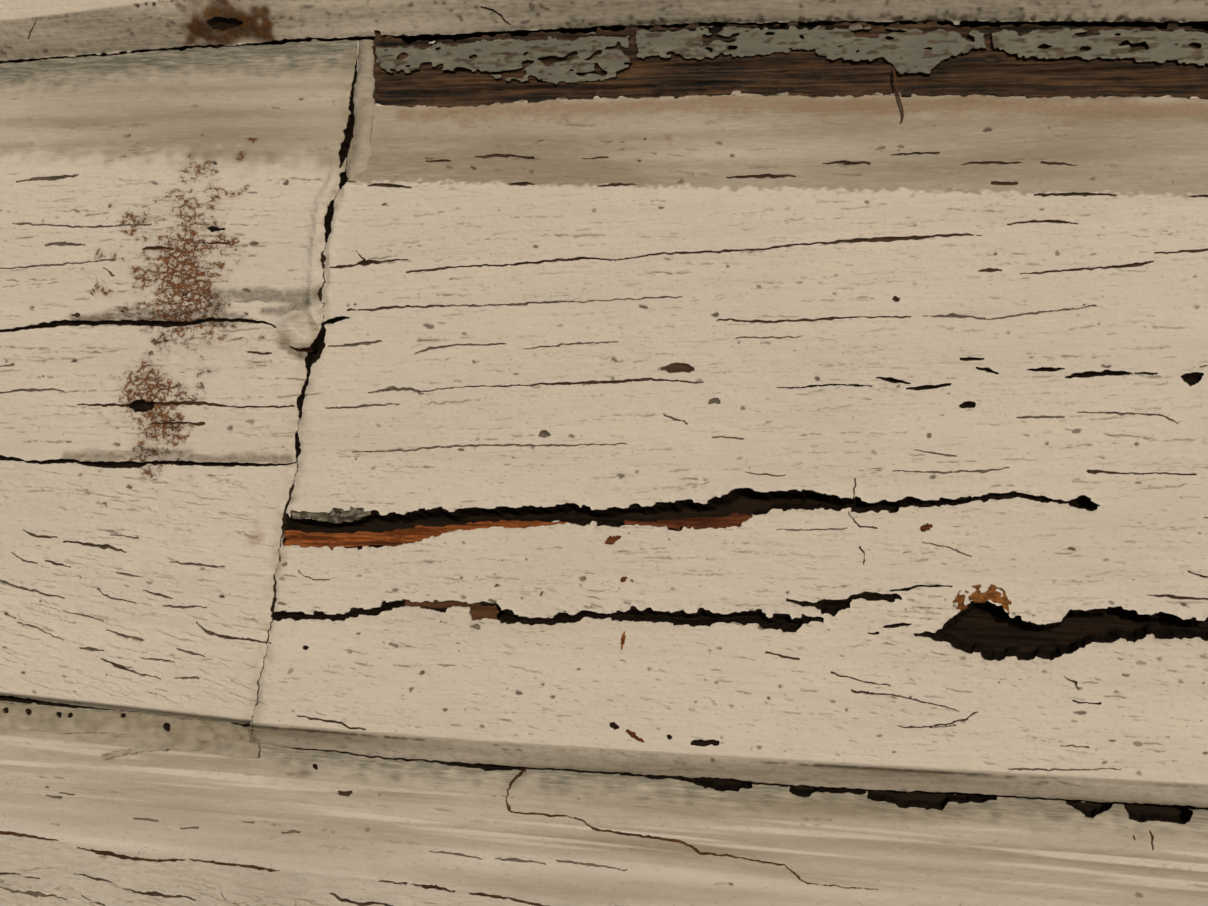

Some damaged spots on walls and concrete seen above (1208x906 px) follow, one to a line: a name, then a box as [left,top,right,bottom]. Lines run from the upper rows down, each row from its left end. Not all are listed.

rust [187,0,275,47]
peeling [376,23,1208,85]
crack [0,317,277,355]
rust [95,155,249,478]
crack [0,363,294,426]
crack [326,377,704,409]
crack [777,357,1158,391]
crack [0,455,296,468]
crack [273,449,1197,660]
crack [830,671,978,728]
crack [506,770,878,890]
crack [379,880,550,906]